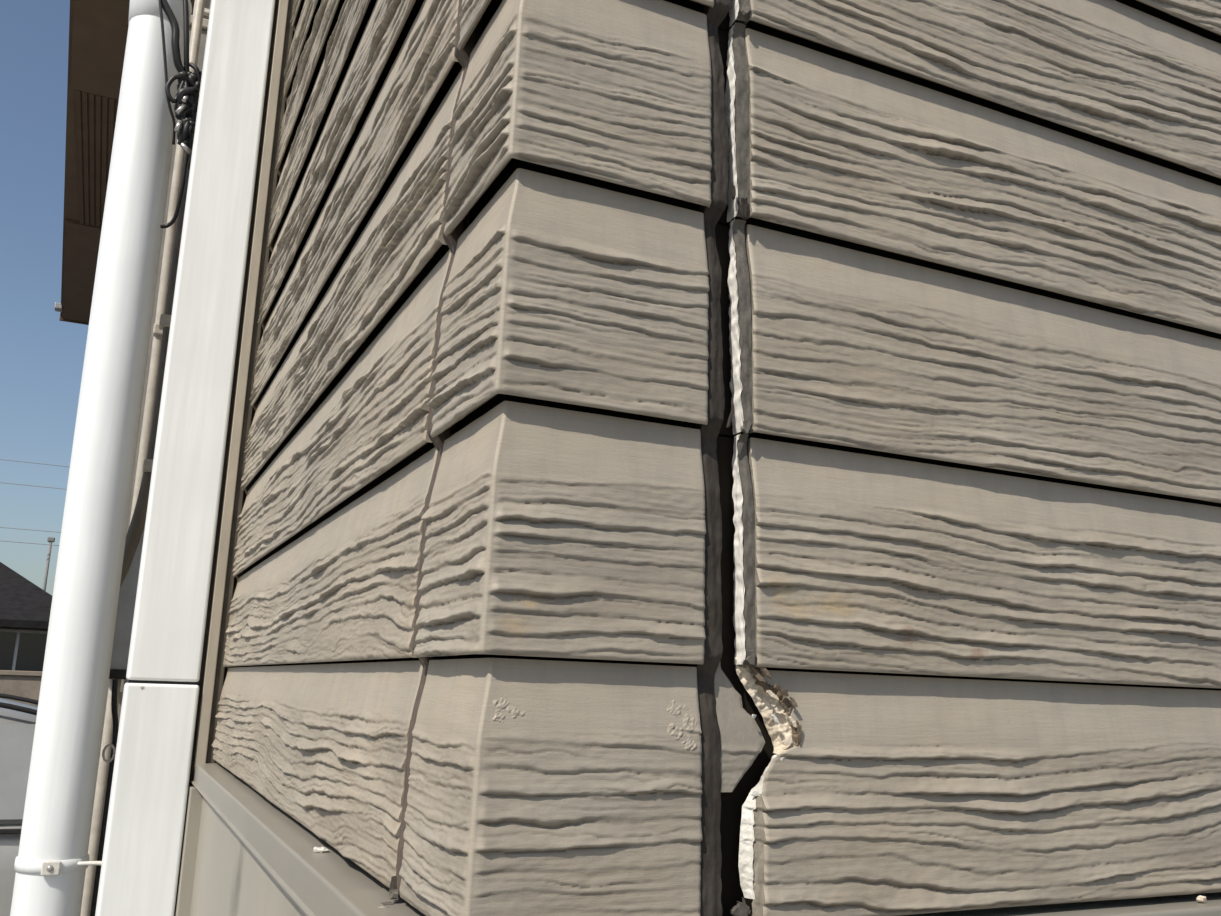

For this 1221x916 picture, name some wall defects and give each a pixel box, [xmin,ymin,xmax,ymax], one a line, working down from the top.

crack [714,0,802,916]